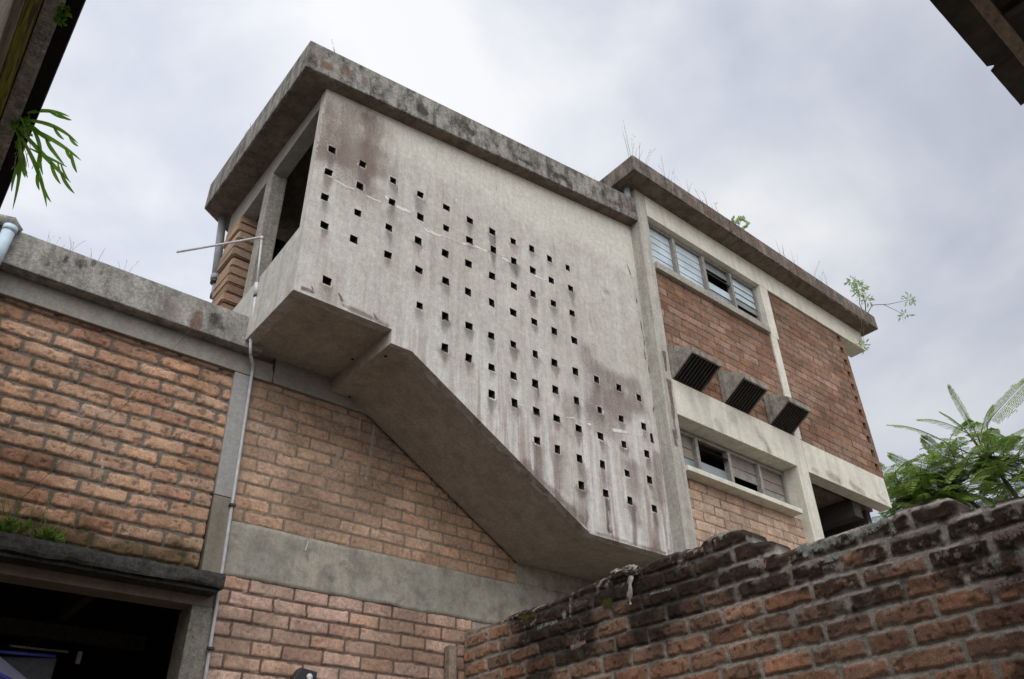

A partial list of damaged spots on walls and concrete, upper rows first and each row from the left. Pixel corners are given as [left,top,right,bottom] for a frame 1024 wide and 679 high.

crack [333,179,549,284]
water stain [524,441,540,478]
water stain [553,462,611,534]
water stain [621,468,671,554]